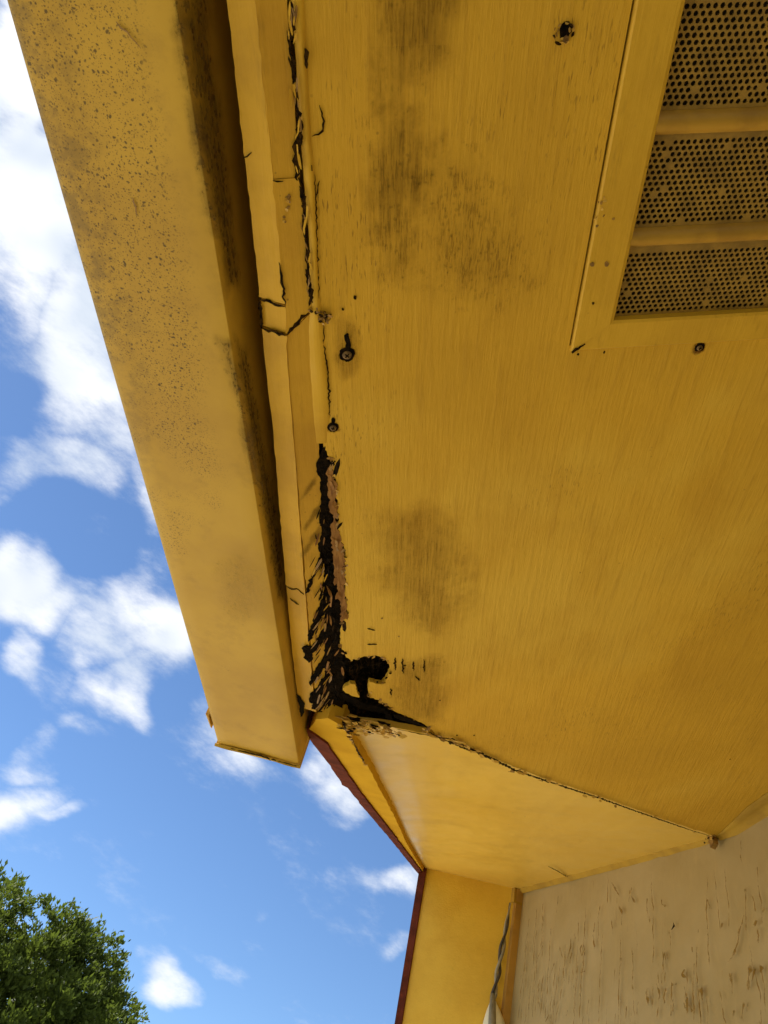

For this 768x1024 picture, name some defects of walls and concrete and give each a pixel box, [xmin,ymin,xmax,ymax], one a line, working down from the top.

crack [258,2,331,415]
peeling [326,462,349,621]